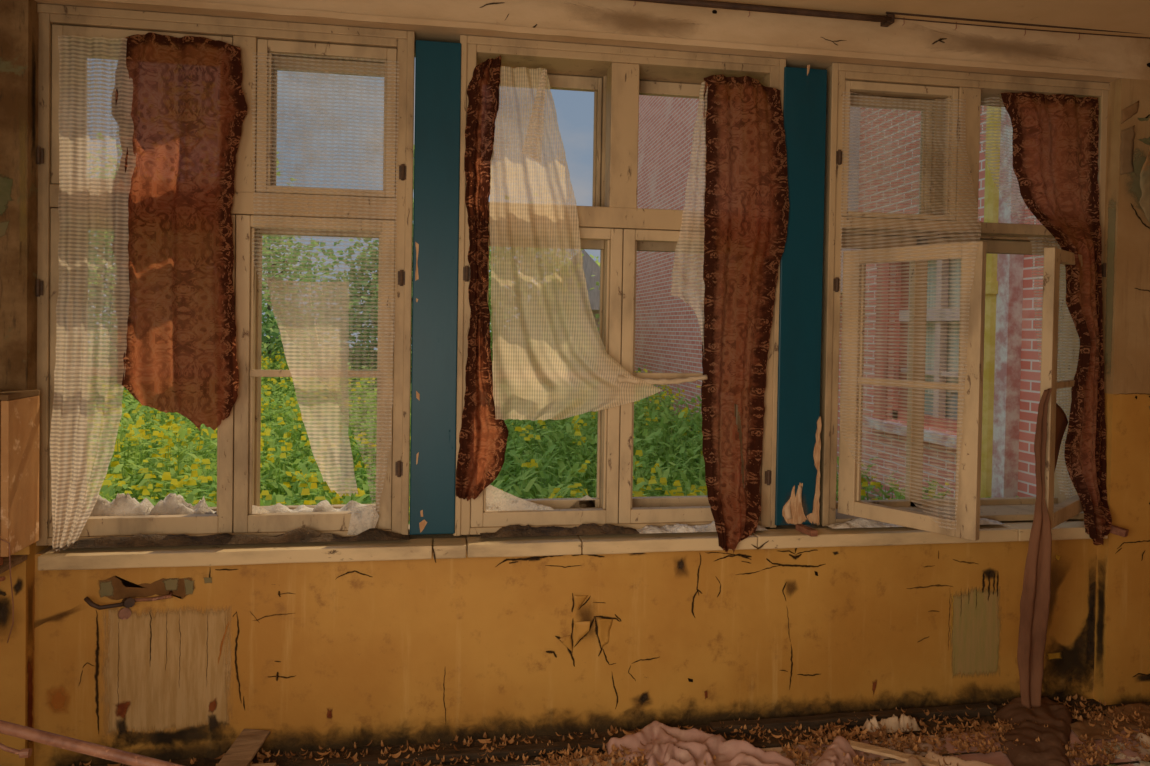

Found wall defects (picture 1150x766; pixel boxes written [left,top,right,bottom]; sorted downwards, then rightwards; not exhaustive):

peeling [782,417,822,526]
crack [691,541,825,617]
water stain [1049,555,1063,614]
crack [497,553,659,709]
crack [781,605,820,690]
water stain [1041,568,1104,701]
water stain [55,753,119,766]
water stain [117,726,231,761]
water stain [256,686,1021,755]